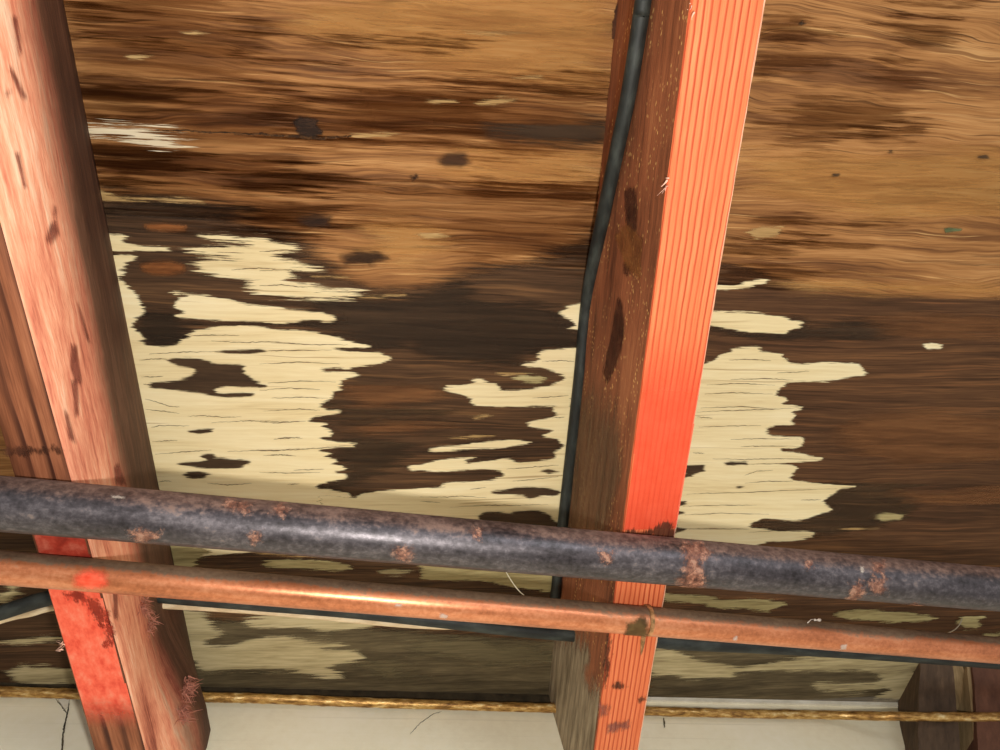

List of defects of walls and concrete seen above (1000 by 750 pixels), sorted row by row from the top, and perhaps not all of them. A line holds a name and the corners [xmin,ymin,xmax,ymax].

damp [81,85,210,103]
damp [489,115,606,145]
peeling [717,279,768,290]
peeling [559,304,580,330]
peeling [711,311,804,334]
peeling [109,234,576,523]
peeling [674,347,866,545]
peeling [378,566,552,592]
peeling [833,609,939,624]
peeling [957,616,1000,637]
peeling [184,610,375,679]
peeling [407,634,553,669]